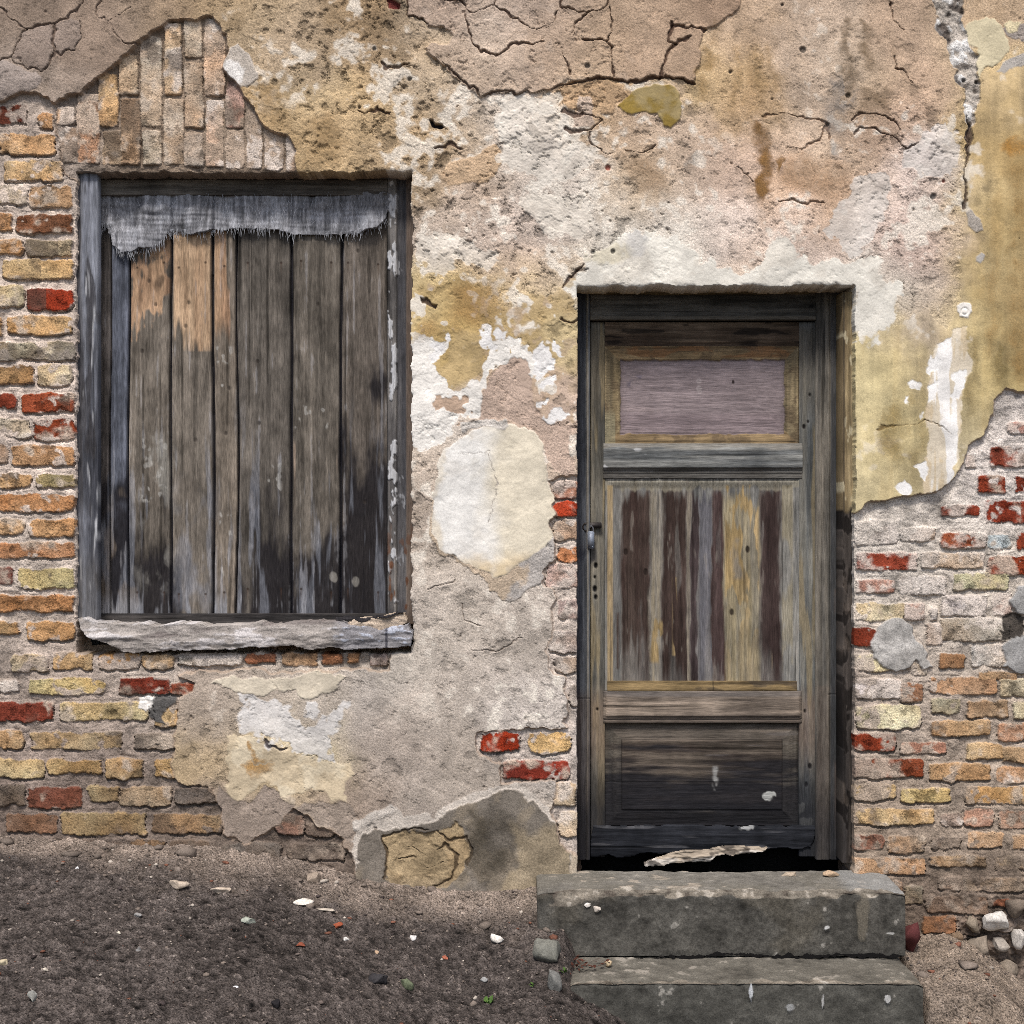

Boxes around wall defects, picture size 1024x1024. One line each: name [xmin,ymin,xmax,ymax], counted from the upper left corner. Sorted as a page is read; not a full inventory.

crack [358,107,391,116]
crack [381,0,708,156]
crack [761,111,920,151]
crack [894,56,915,84]
crack [778,198,825,206]
crack [962,128,974,210]
spalling [0,15,392,877]
spalling [410,0,1024,980]
spalling [383,821,471,889]